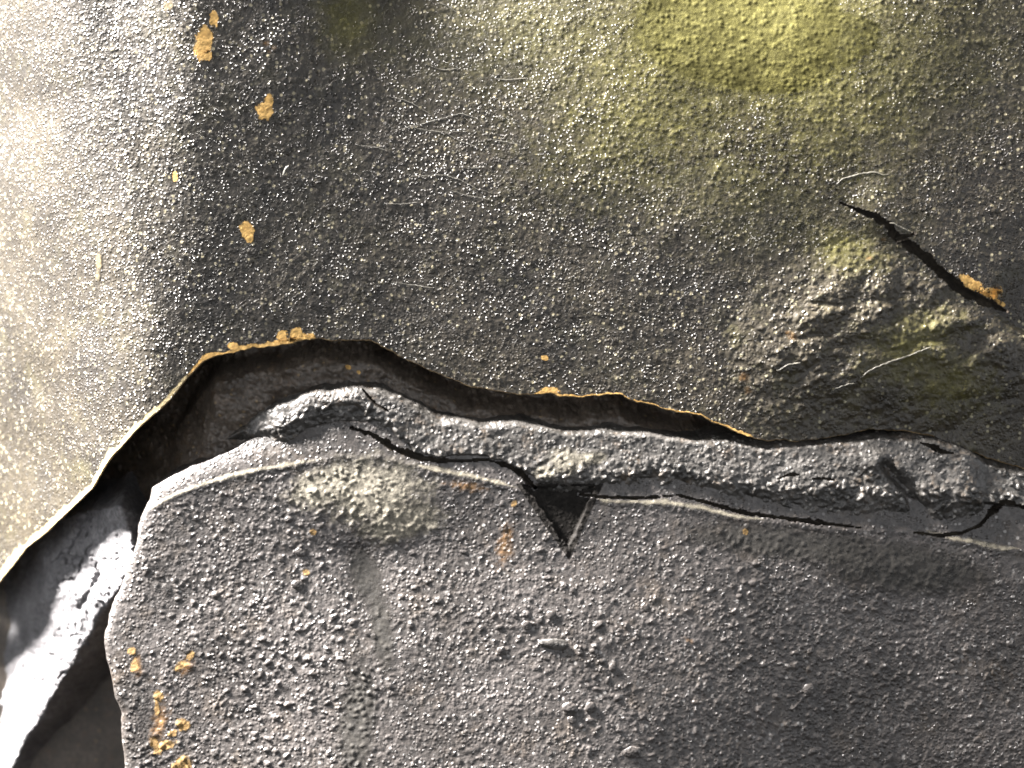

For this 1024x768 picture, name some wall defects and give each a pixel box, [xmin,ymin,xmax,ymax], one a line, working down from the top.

crack [839,201,1007,312]
crack [350,389,536,489]
crack [920,442,952,454]
crack [778,473,833,481]
spalling [0,327,935,734]
crack [579,493,860,529]
crack [913,499,1024,538]
spalling [29,675,125,768]
peeling [150,718,191,768]